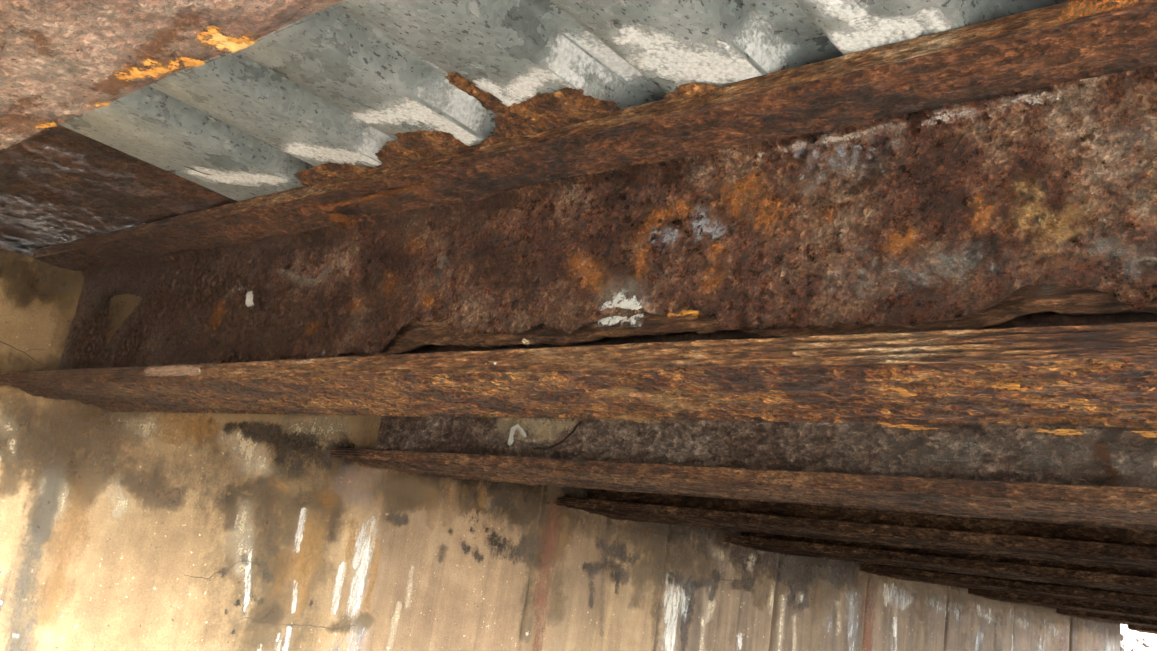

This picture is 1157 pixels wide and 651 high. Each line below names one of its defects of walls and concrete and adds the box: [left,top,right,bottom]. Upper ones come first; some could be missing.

corrosion [0,95,69,138]
corrosion [88,14,310,107]
corrosion [187,20,791,187]
peeling [794,142,882,191]
corrosion [1011,182,1090,258]
water stain [0,241,84,349]
corrosion [72,182,438,376]
corrosion [874,421,938,430]
corrosion [1031,428,1084,436]
water stain [0,401,183,651]
water stain [202,418,363,651]
water stain [331,476,1124,651]